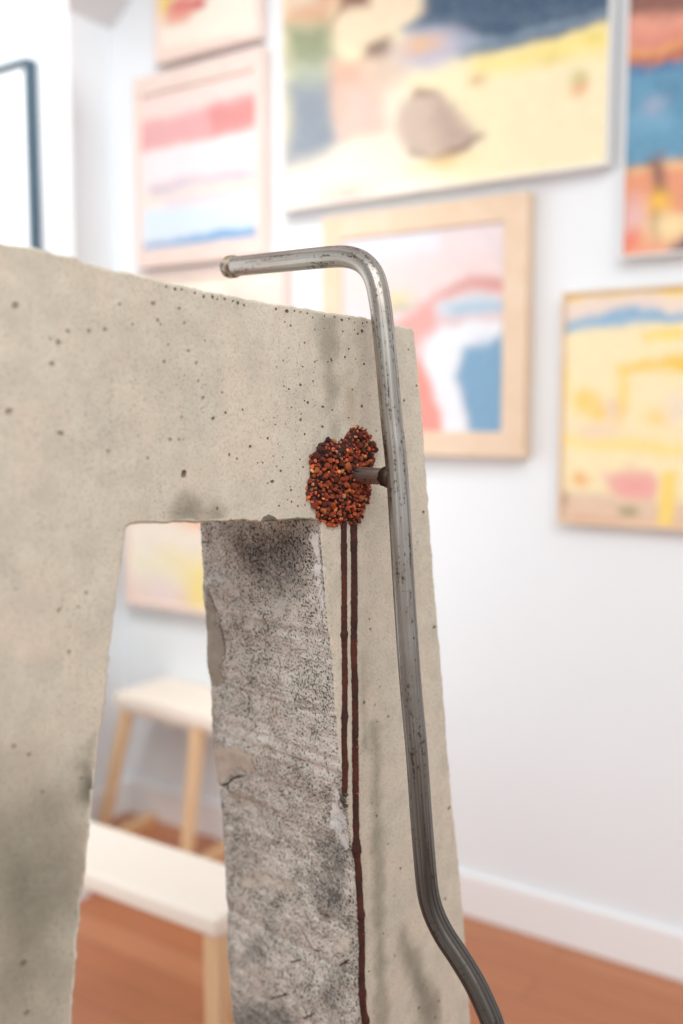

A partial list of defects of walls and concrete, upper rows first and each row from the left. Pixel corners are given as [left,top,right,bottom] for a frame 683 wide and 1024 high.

spalling [261,486,315,521]
spalling [203,584,225,693]
corrosion [305,425,379,1024]